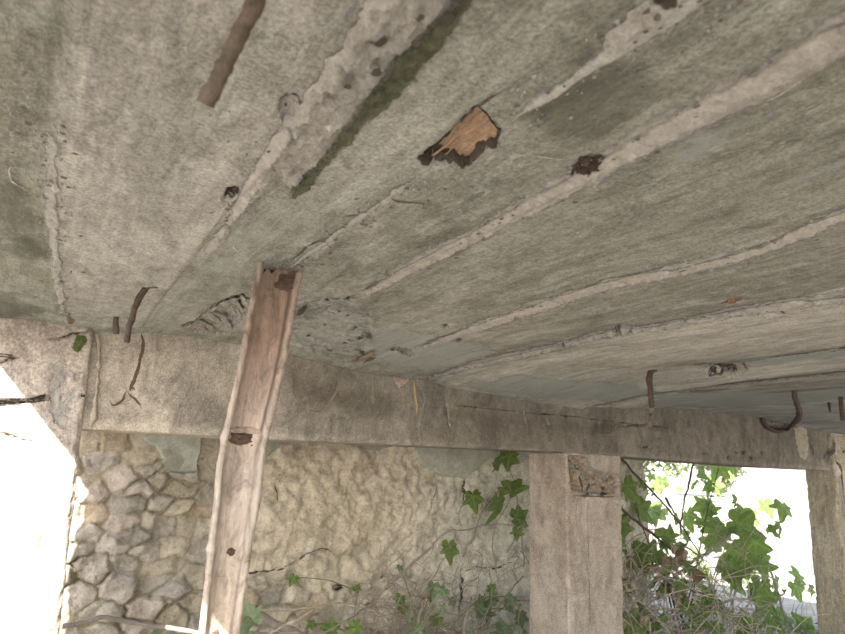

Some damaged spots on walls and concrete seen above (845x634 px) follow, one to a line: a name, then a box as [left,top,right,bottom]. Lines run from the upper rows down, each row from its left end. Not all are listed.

spalling [277,93,298,122]
spalling [418,89,504,169]
rust [570,154,605,177]
spalling [224,186,239,198]
spalling [692,363,747,377]
spalling [568,455,621,498]